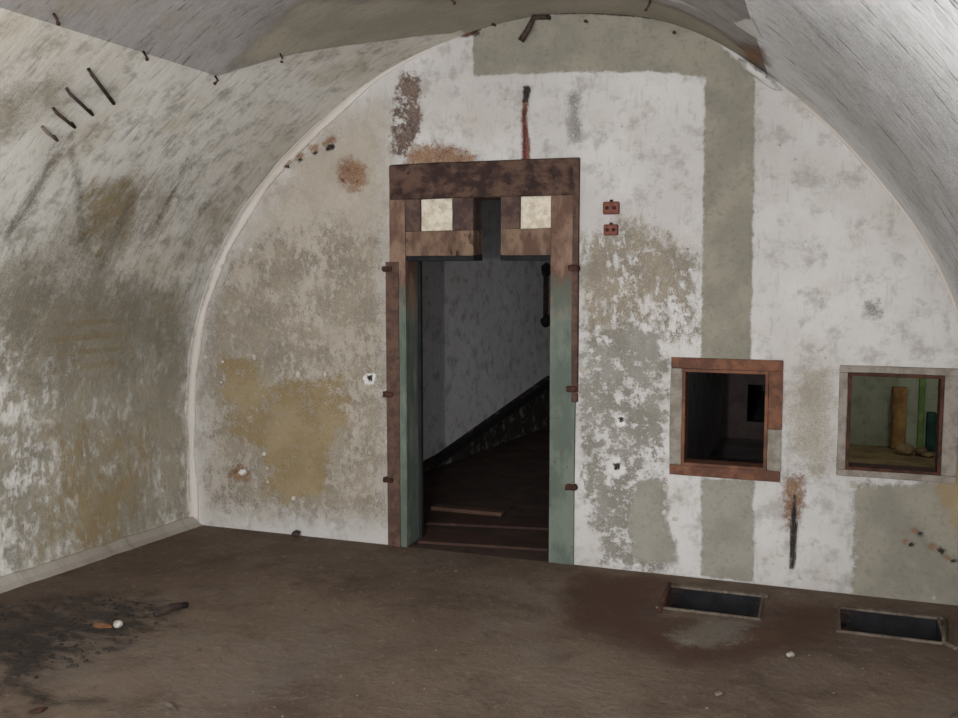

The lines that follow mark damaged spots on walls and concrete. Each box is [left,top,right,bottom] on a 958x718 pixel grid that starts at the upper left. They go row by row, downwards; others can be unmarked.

corrosion [734,42,772,69]
corrosion [334,156,371,194]
corrosion [403,139,478,164]
corrosion [519,85,531,159]
peeling [222,0,766,584]
peeling [0,208,390,578]